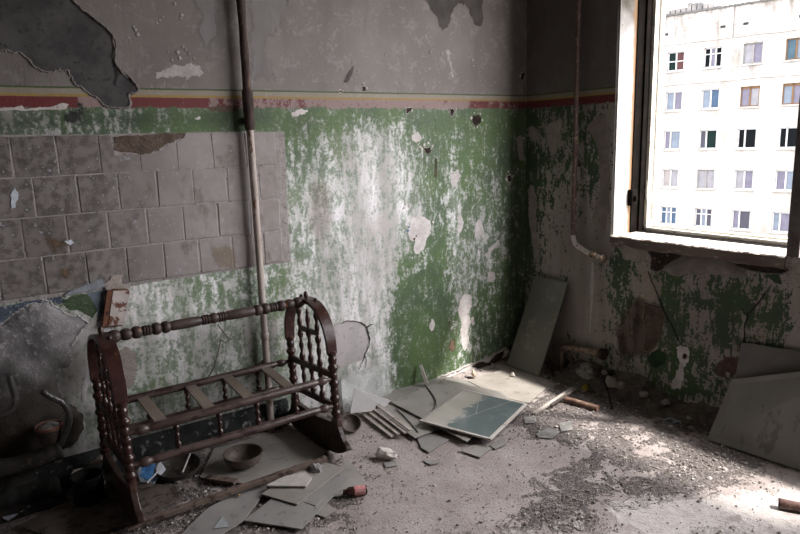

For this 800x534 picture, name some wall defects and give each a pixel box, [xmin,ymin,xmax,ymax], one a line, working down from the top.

peeling [425,0,483,30]
spalling [0,0,140,111]
peeling [155,46,204,80]
spalling [114,133,184,155]
peeling [588,114,612,237]
peeling [403,202,435,260]
peeling [0,274,130,323]
crack [646,271,680,343]
spalling [334,320,369,366]
crack [343,320,373,369]
spalling [437,347,510,378]
spalling [648,345,690,389]